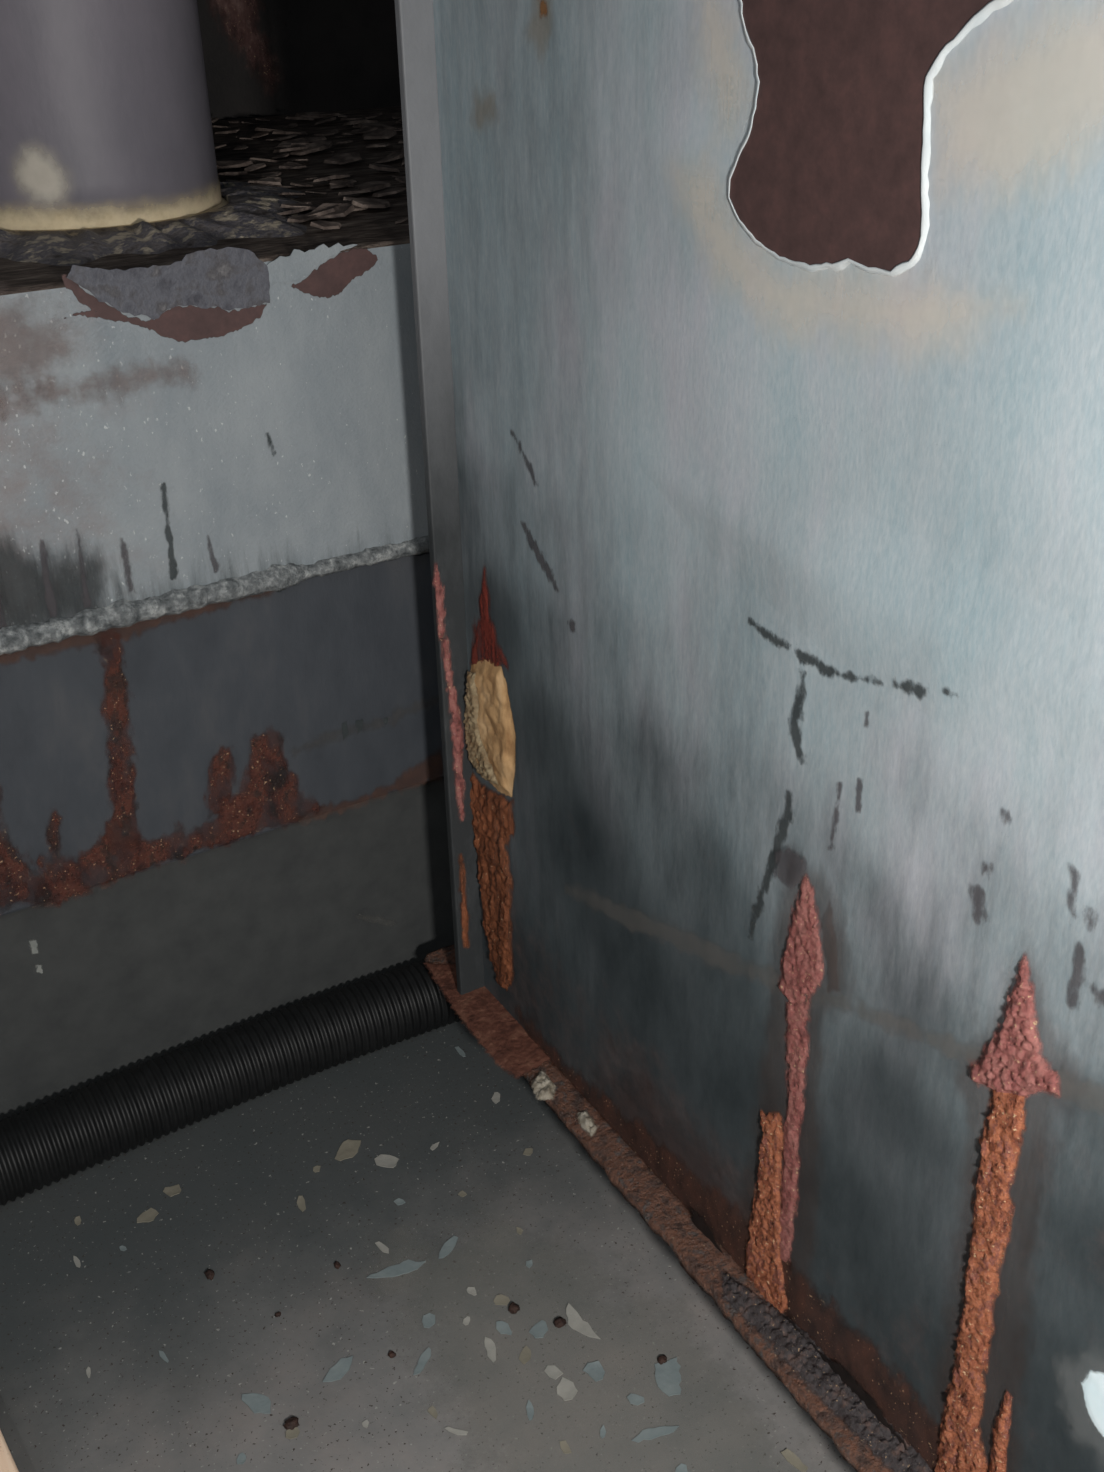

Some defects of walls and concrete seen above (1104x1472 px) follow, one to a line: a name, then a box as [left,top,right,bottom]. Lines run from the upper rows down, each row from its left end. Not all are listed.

peeling [727,0,1013,277]
peeling [62,243,378,343]
rust [0,564,515,990]
crack [750,673,806,936]
crack [830,779,863,848]
rust [519,848,1060,1472]
peeling [1063,1355,1104,1454]